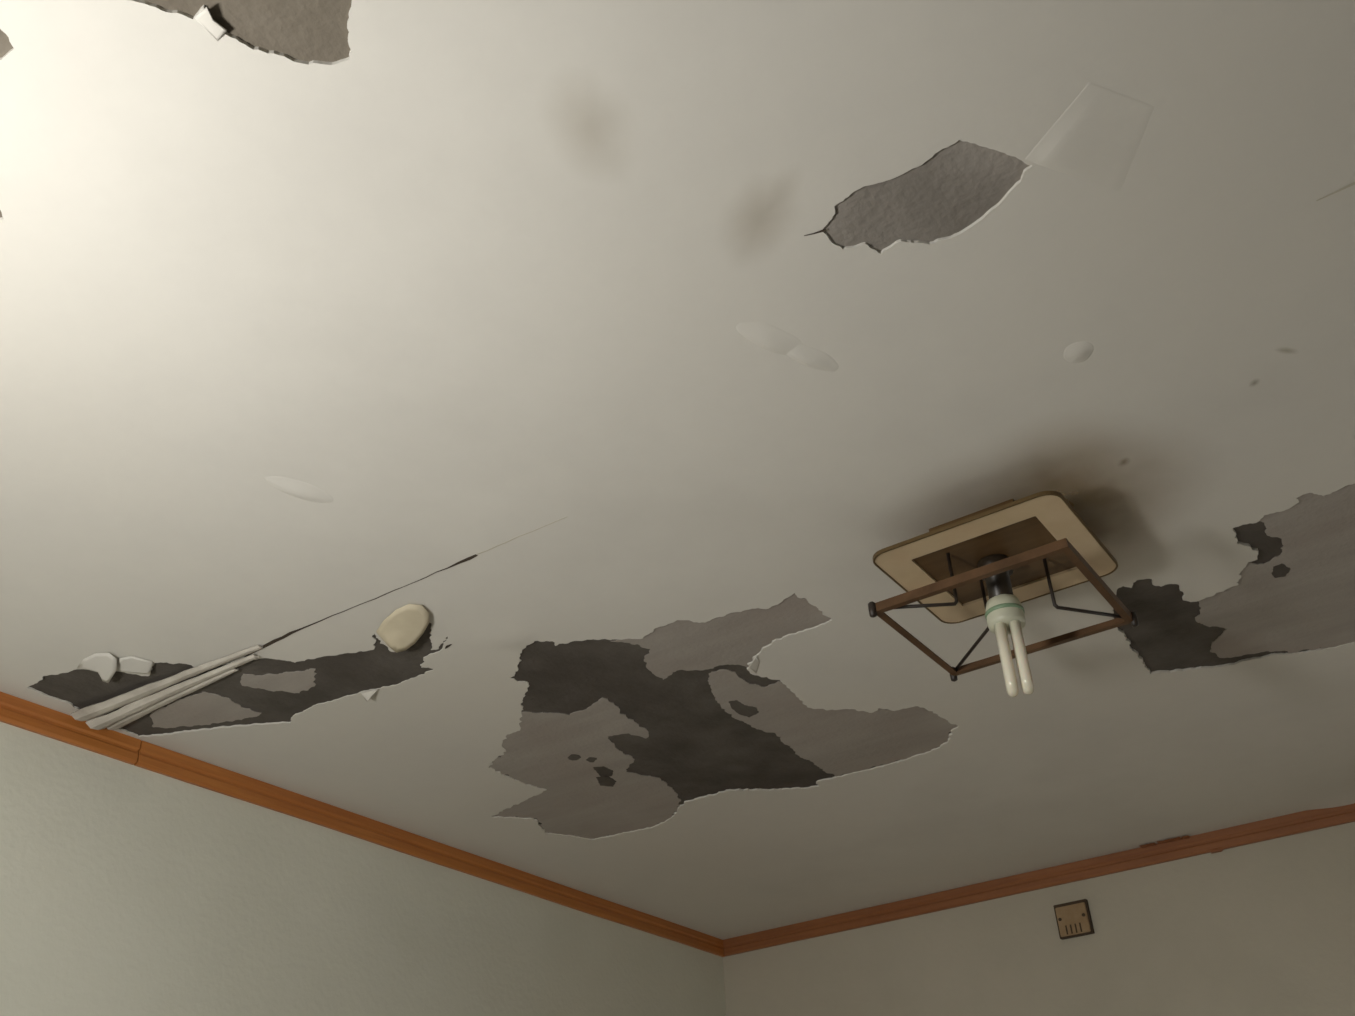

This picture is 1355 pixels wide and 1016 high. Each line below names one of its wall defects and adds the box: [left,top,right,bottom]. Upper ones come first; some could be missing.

peeling [0,29,13,58]
peeling [144,0,352,62]
peeling [823,140,1030,252]
crack [244,517,566,657]
peeling [1113,484,1355,672]
peeling [29,604,448,736]
peeling [489,593,957,839]